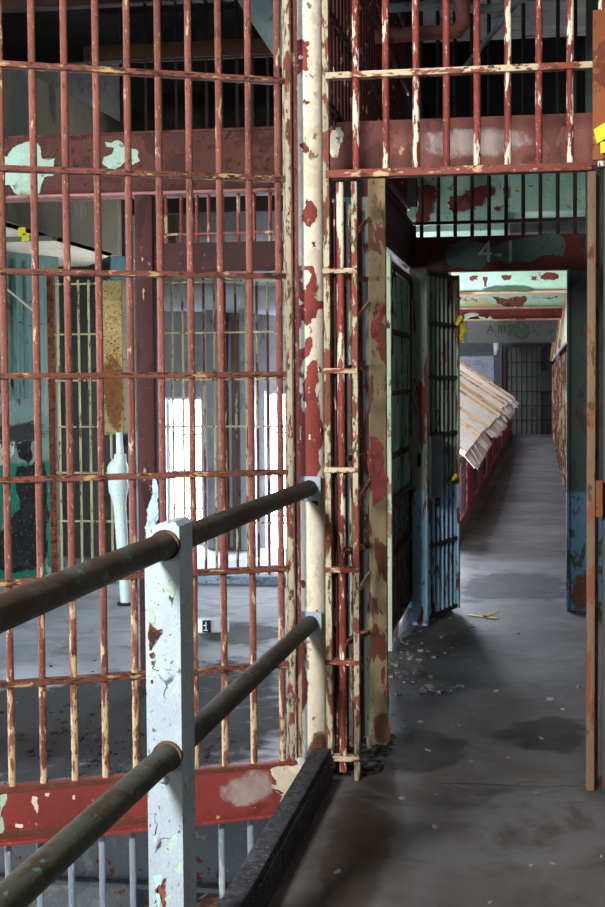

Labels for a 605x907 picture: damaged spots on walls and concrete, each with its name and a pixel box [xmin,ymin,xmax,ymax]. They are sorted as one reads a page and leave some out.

peeling [5,141,55,195]
peeling [102,140,140,169]
peeling [302,198,317,227]
peeling [447,185,509,212]
peeling [493,295,558,309]
peeling [299,266,324,476]
rust [104,357,124,432]
peeling [366,435,389,504]
flaking render [0,441,50,573]
water stain [390,730,465,771]
water stain [503,717,585,751]
peeling [270,765,301,802]